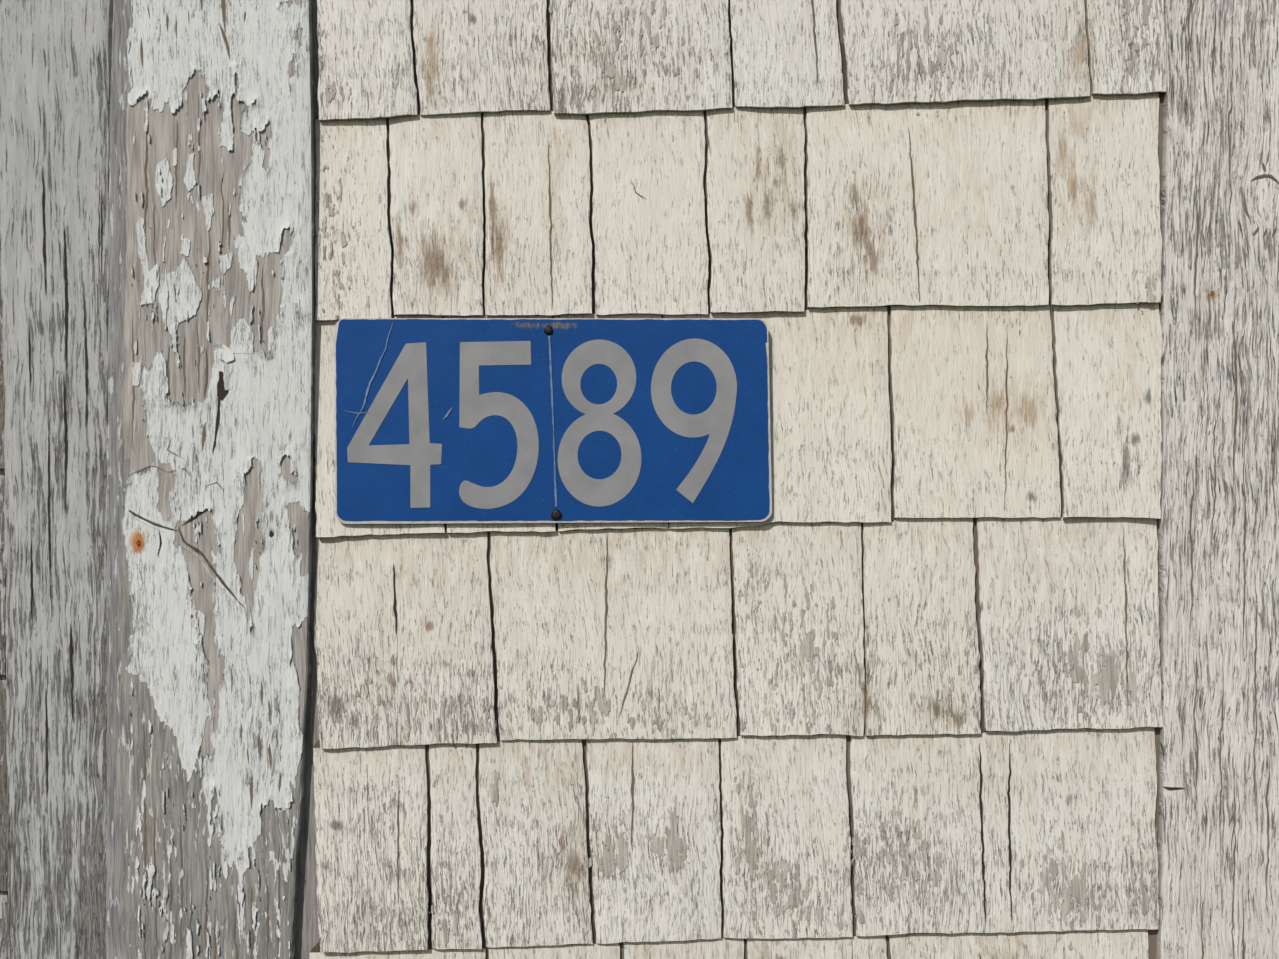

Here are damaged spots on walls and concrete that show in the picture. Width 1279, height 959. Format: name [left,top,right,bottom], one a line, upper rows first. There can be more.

peeling [287,28,303,78]
crack [259,266,267,338]
crack [121,92,244,612]
corrosion [131,531,144,552]
peeling [108,70,302,959]
peeling [286,501,309,577]